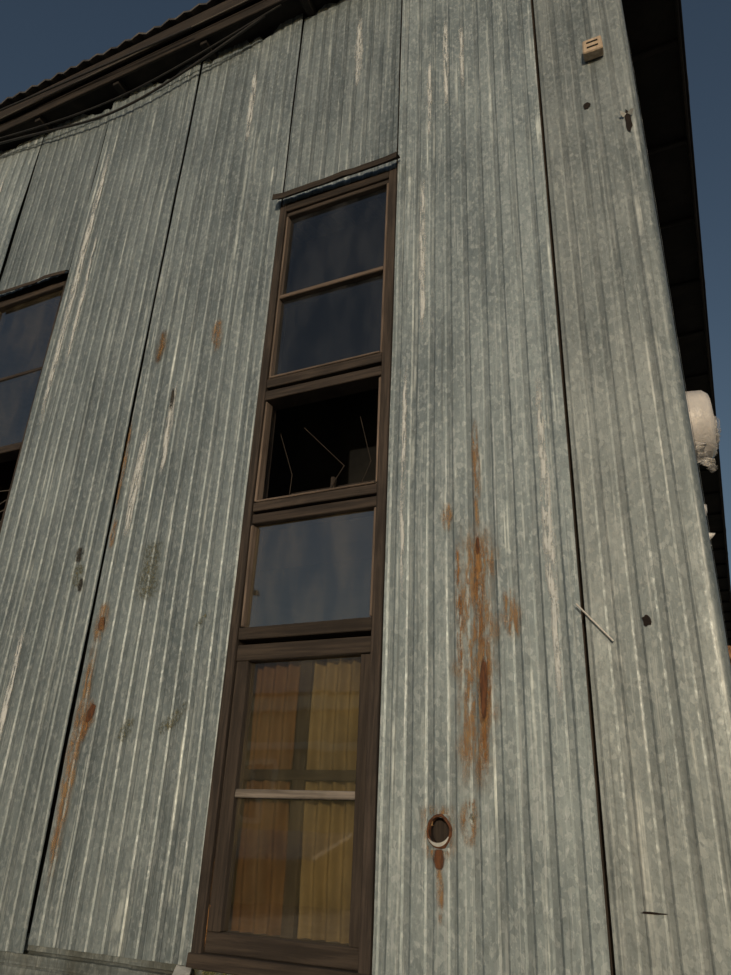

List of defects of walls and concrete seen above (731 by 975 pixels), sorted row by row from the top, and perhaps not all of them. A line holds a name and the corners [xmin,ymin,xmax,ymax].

corrosion [455,537,493,769]
corrosion [79,702,95,740]
corrosion [431,849,449,919]